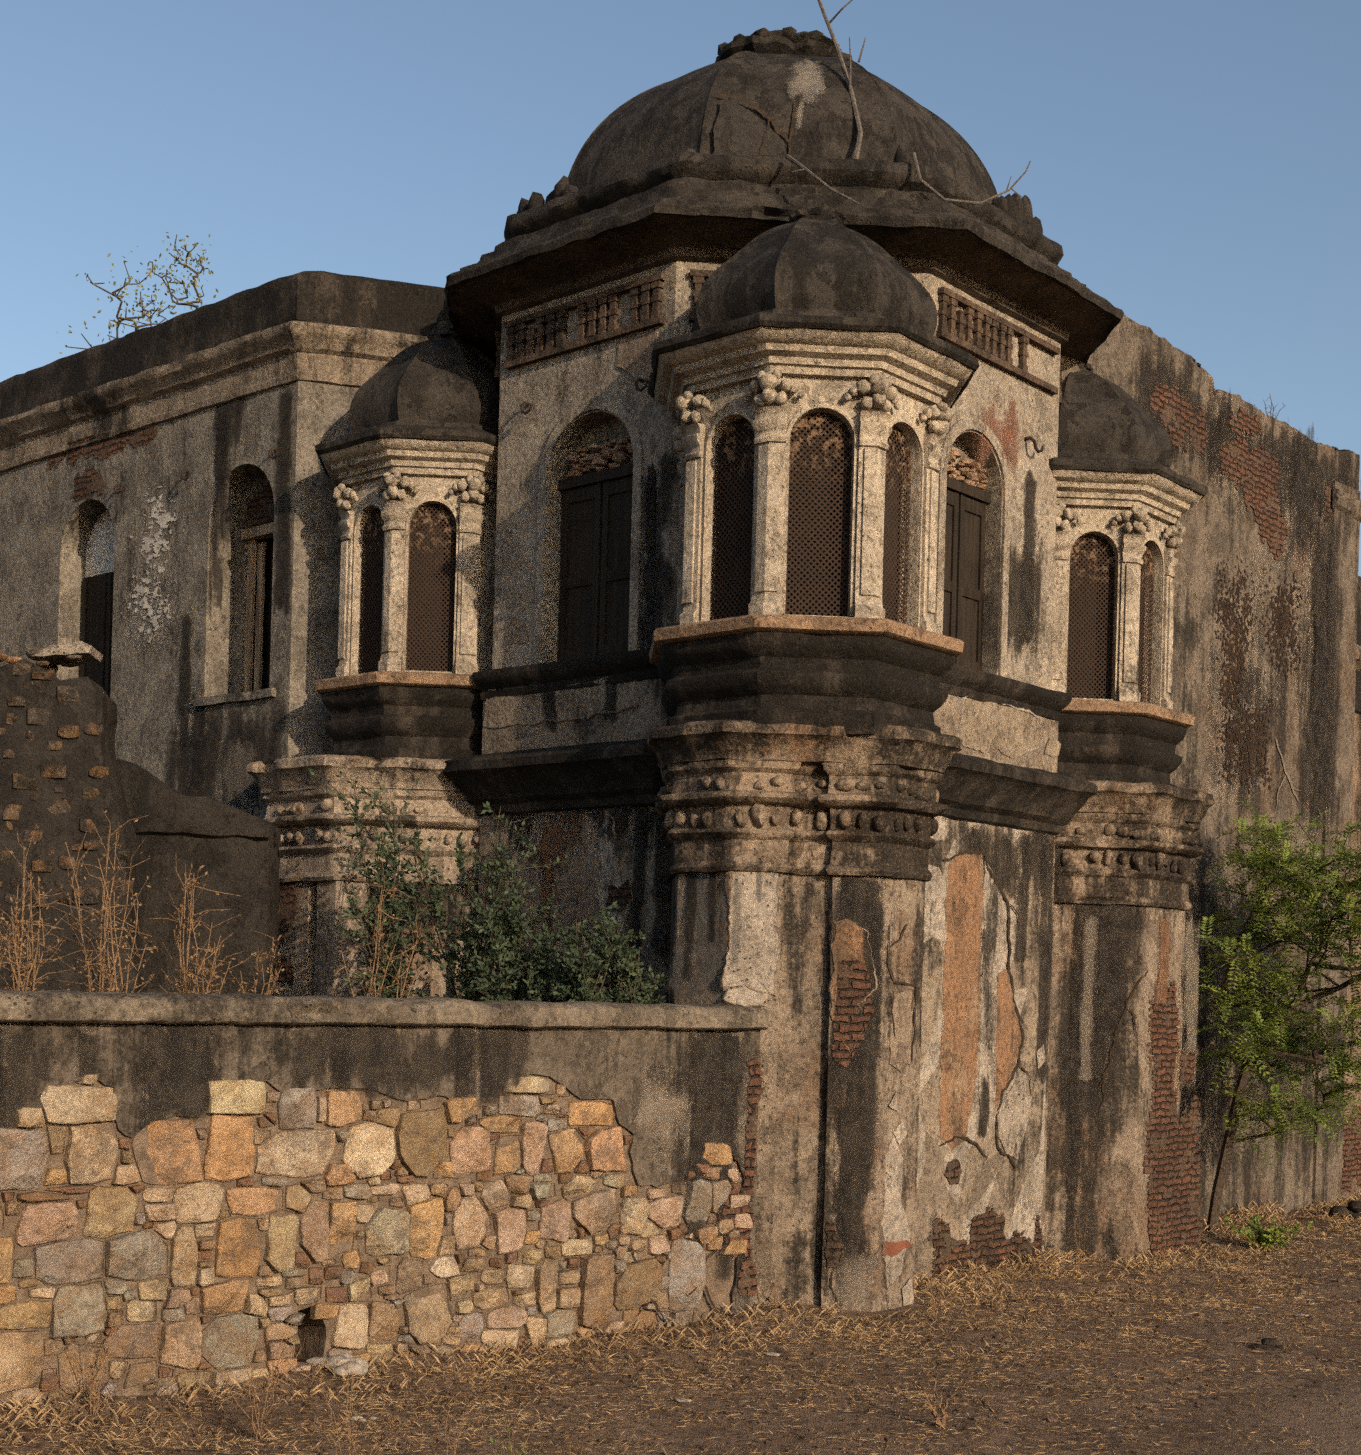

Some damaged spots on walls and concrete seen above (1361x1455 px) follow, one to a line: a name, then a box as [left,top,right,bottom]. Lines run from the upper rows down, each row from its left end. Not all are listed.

damp [212,397,244,610]
damp [275,388,293,614]
damp [638,452,677,649]
flaking render [1150,382,1307,795]
damp [1135,343,1361,841]
damp [166,614,286,808]
flaking render [720,1059,764,1296]
peeling [828,919,878,1067]
damp [828,876,884,1275]
flaking render [879,1092,1045,1306]
peeling [938,853,1046,1185]
flaking render [1143,917,1205,1257]